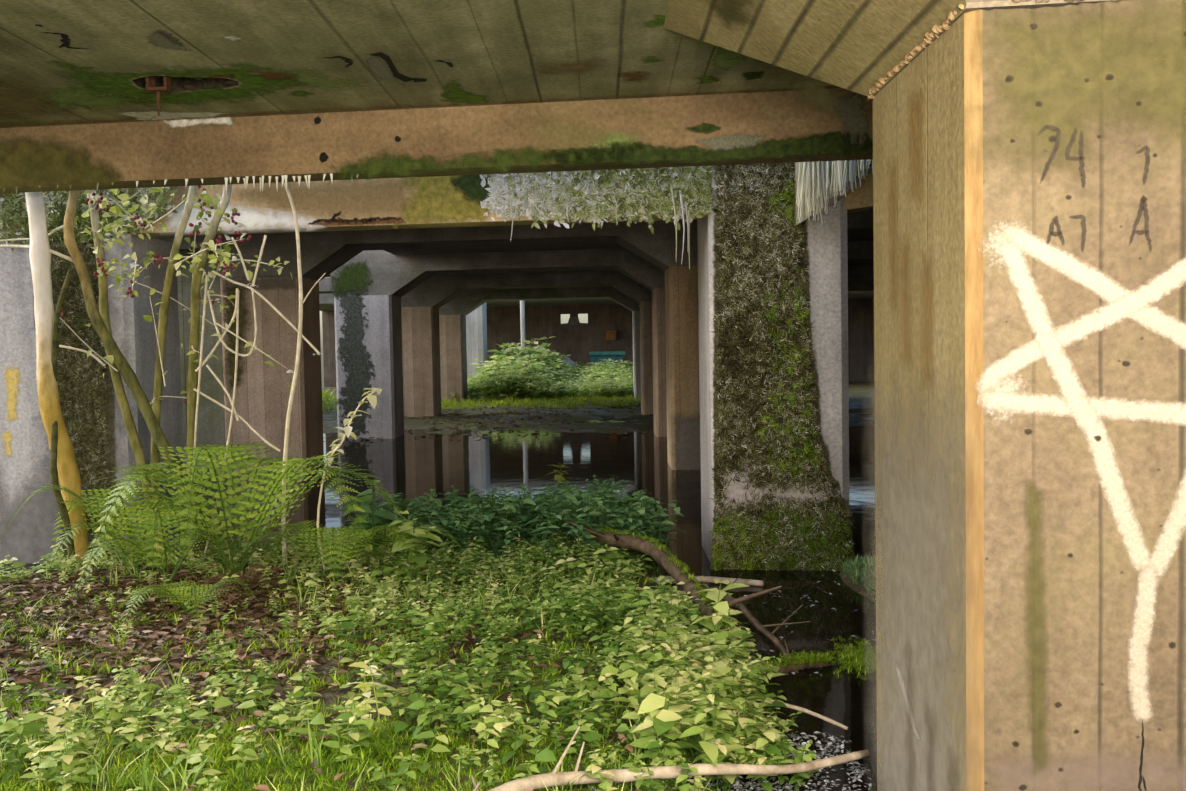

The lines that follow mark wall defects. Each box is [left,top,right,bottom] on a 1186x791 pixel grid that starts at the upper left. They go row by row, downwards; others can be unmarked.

spalling [132,76,238,116]
damp [0,81,483,127]
damp [688,123,766,150]
damp [1000,487,1186,791]
crack [1138,719,1147,791]